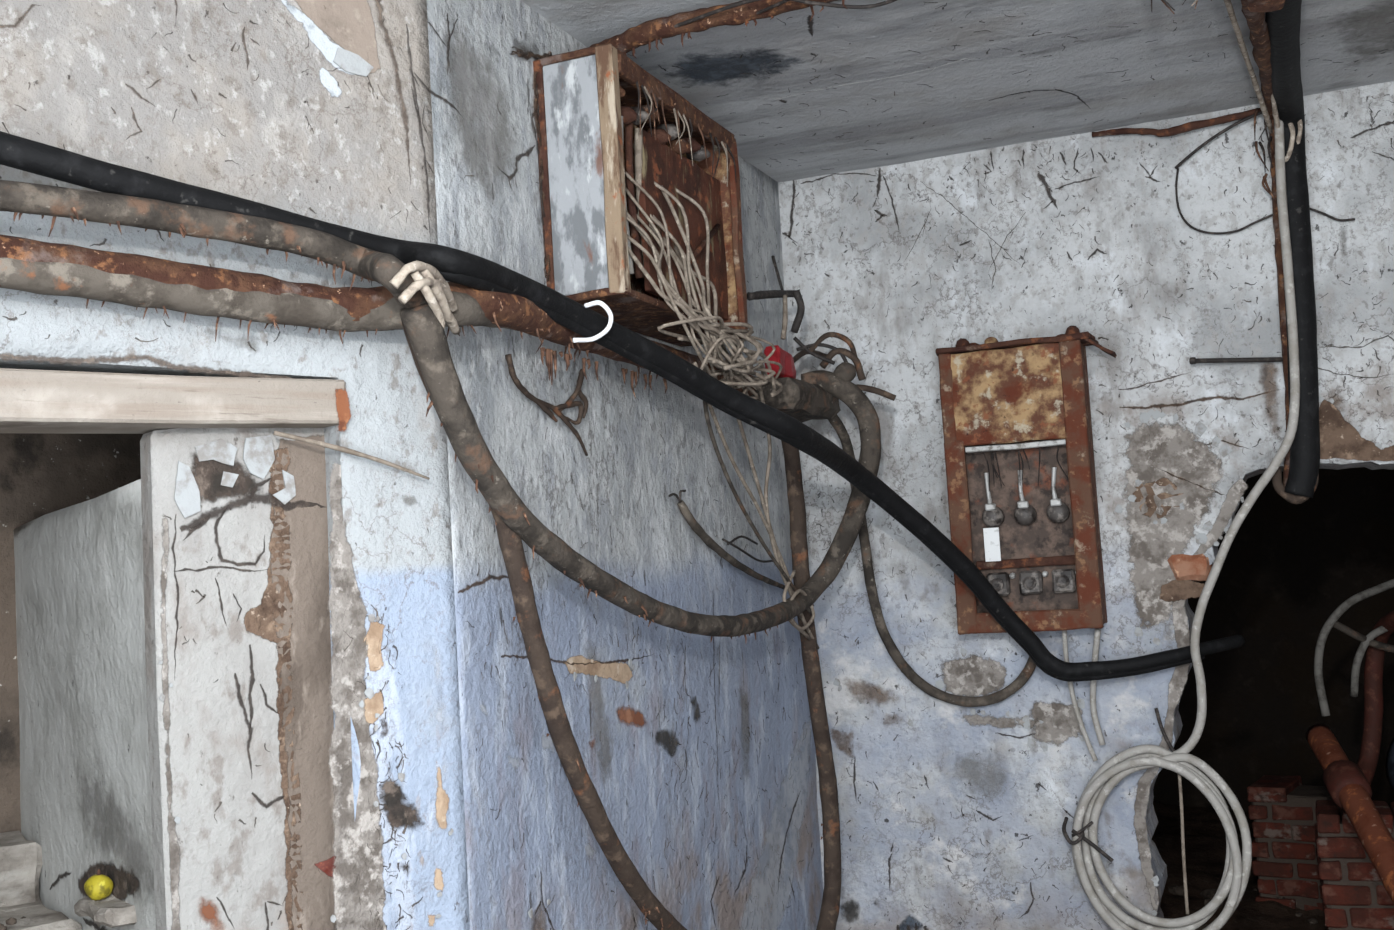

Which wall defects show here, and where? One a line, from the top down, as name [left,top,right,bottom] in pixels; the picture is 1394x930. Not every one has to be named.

crack [0,4,41,28]
spalling [281,0,381,97]
crack [125,79,160,139]
crack [375,0,462,242]
crack [1351,121,1394,160]
crack [1318,335,1394,378]
spalling [1319,396,1394,461]
spalling [1115,409,1248,750]
crack [171,478,325,808]
spalling [158,435,454,930]
spalling [565,655,634,689]
spalling [1133,767,1160,916]